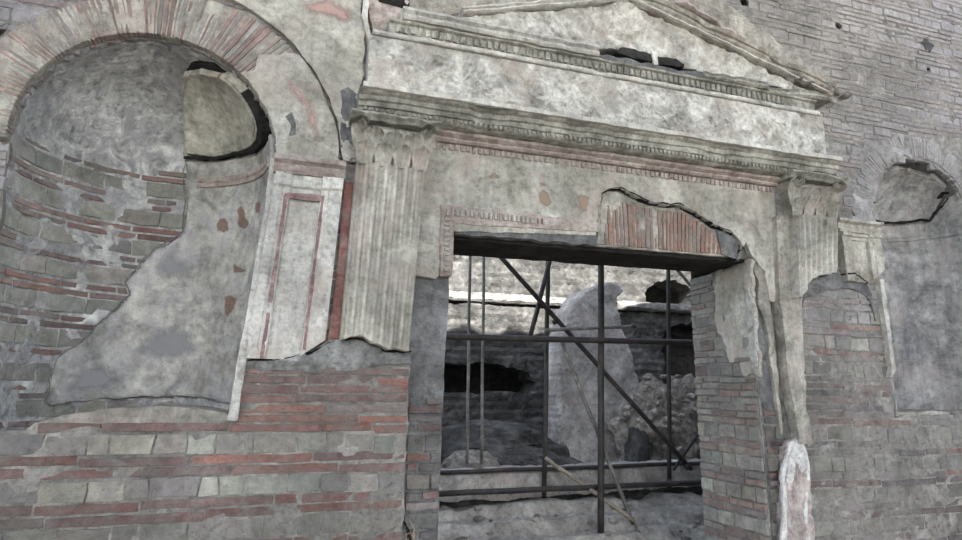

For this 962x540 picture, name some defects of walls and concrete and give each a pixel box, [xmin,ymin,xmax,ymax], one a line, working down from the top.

crack [874,169,949,224]
spalling [597,187,743,267]
flaking render [45,151,187,403]
spalling [800,272,876,321]
crack [403,521,415,540]